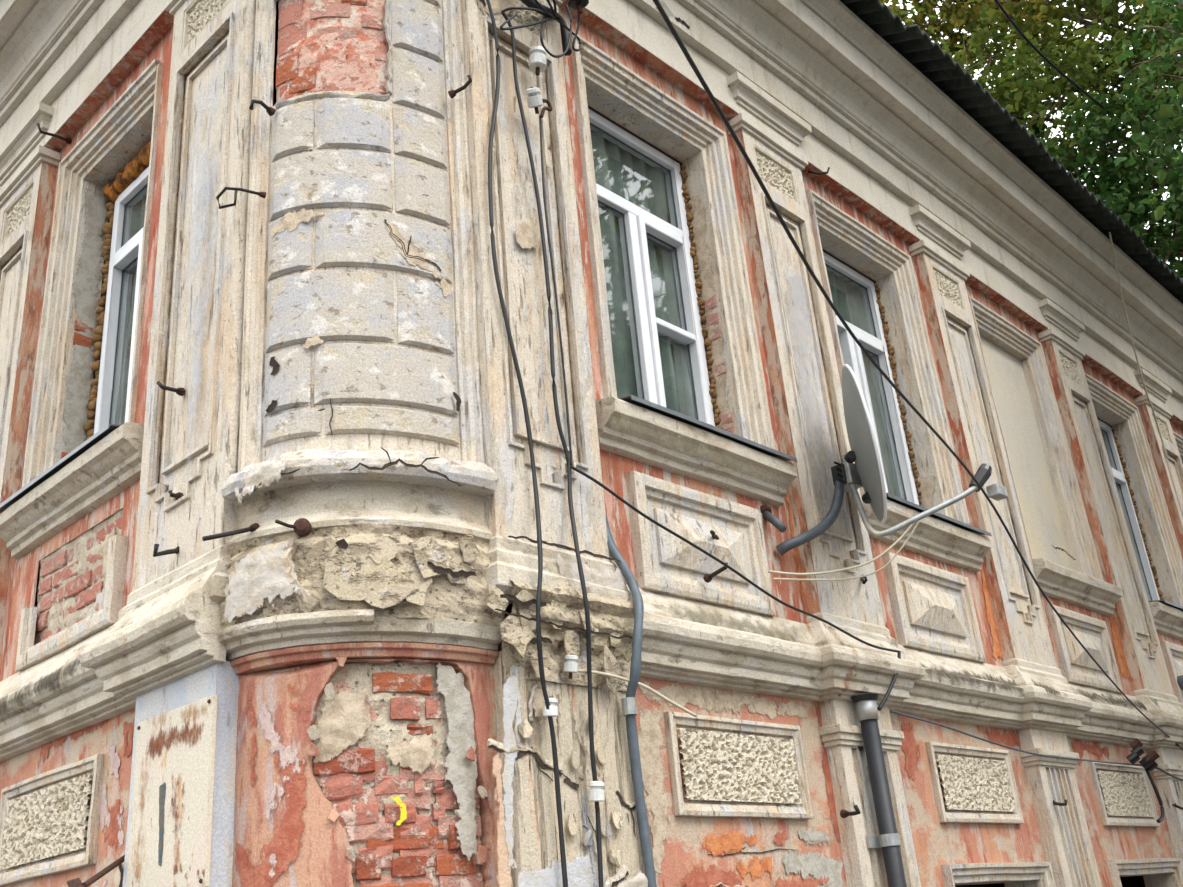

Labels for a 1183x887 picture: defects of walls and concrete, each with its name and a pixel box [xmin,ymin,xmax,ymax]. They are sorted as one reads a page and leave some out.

flaking render [275,0,393,109]
crack [318,398,333,435]
crack [349,447,461,487]
flaking render [34,508,123,645]
flaking render [222,535,479,623]
flaking render [554,552,631,593]
peeling [786,491,821,616]
flaking render [235,583,844,887]